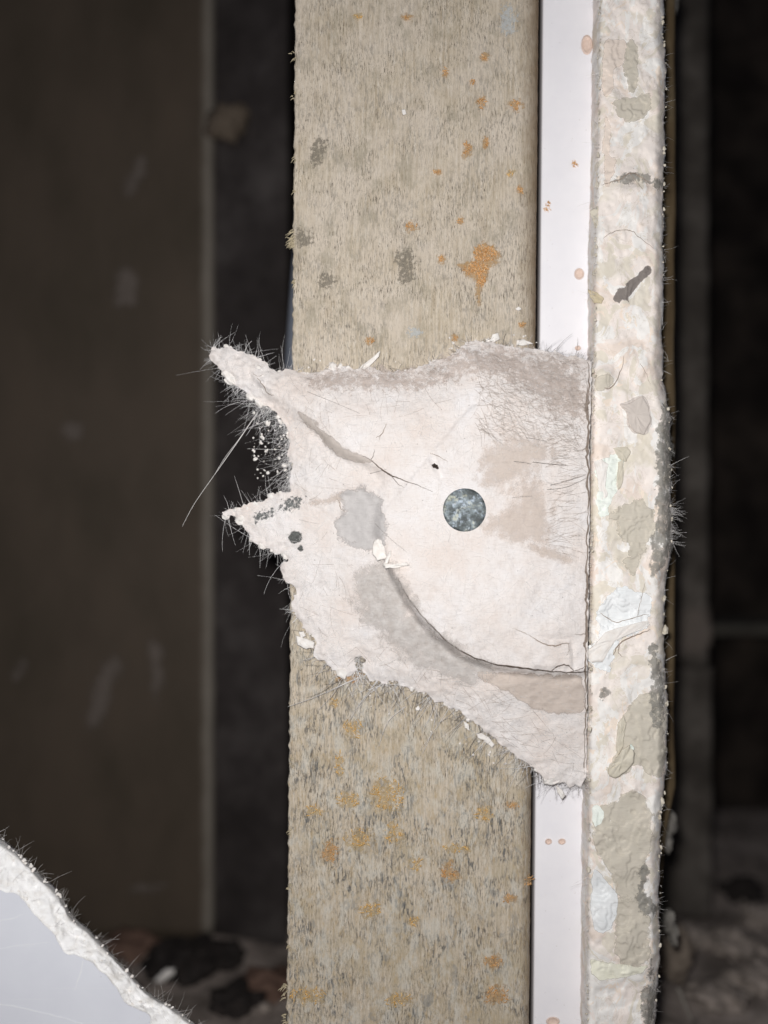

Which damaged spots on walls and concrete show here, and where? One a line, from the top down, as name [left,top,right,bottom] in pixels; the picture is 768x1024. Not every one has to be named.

peeling [601,39,651,122]
rust [458,243,500,303]
spalling [298,412,371,463]
peeling [620,396,652,435]
spalling [254,496,307,525]
spalling [288,531,303,551]
spalling [335,486,492,685]
crack [398,357,651,768]
peeling [587,447,656,672]
peeling [607,693,667,778]
spalling [0,829,203,1024]
peeling [590,791,653,980]